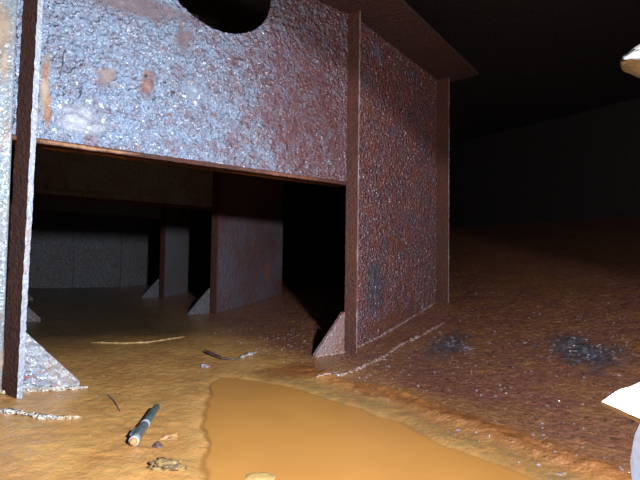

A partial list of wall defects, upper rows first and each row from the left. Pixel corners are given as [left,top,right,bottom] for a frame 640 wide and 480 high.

rust [41,63,50,125]
rust [41,140,132,159]